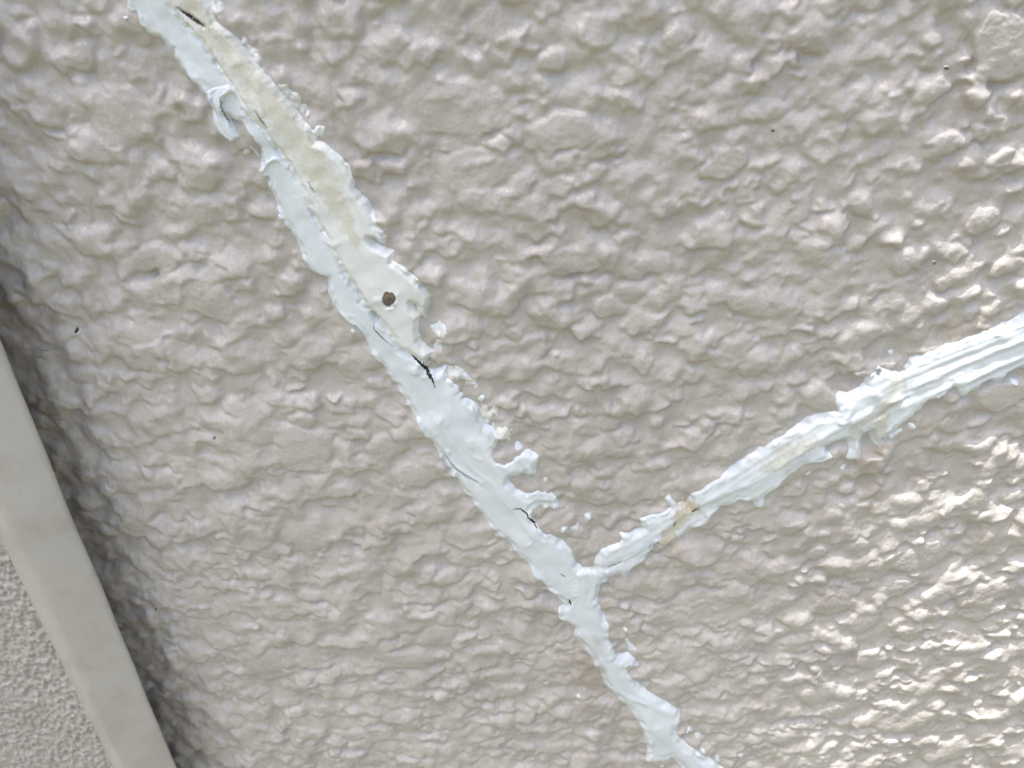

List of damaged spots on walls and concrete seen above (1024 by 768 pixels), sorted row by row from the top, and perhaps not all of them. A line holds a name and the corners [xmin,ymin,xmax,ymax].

crack [127,0,583,603]
crack [558,312,1024,768]